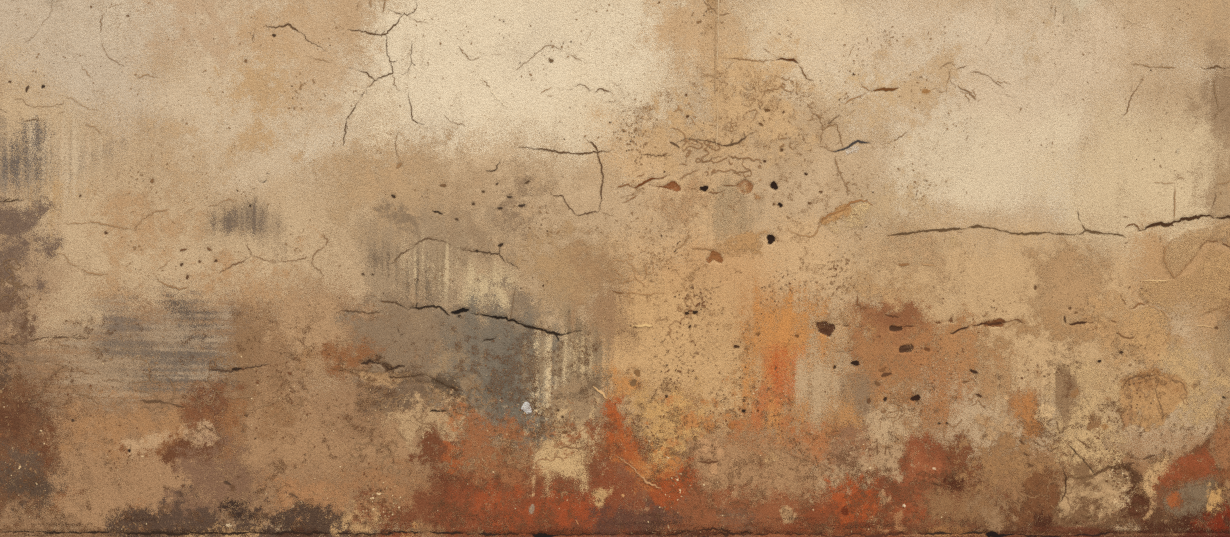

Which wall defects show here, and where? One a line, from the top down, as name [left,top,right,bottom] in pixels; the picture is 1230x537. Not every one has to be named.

crack [248,9,464,158]
crack [459,31,625,102]
crack [58,253,114,275]
crack [65,198,235,231]
crack [0,258,302,436]
rust [114,274,1066,537]
crack [328,48,932,501]
crack [951,319,1026,334]
crack [910,370,1191,525]
crack [888,177,1230,278]
crack [1064,286,1172,343]
rust [1084,410,1230,537]